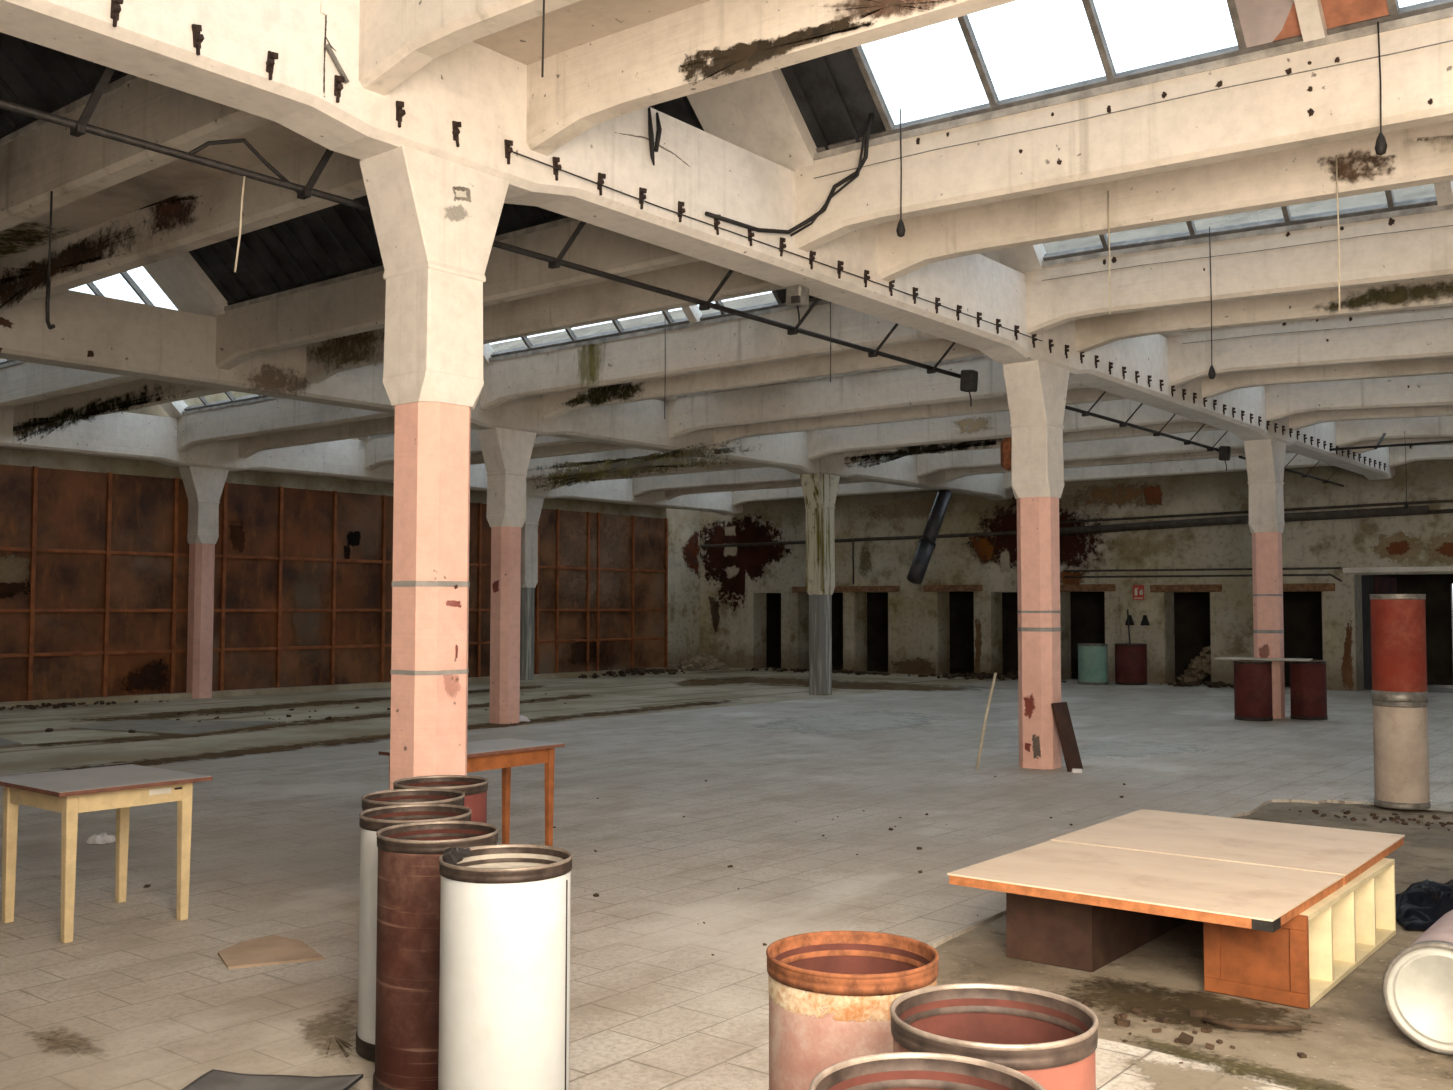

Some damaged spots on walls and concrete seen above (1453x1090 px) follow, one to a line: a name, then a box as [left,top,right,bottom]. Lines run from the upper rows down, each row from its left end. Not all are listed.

mould [679,0,944,84]
water stain [0,195,197,309]
mould [1319,282,1453,312]
mould [310,331,385,374]
mould [249,365,307,396]
mould [13,385,162,442]
water stain [531,442,741,490]
peeling [722,525,739,578]